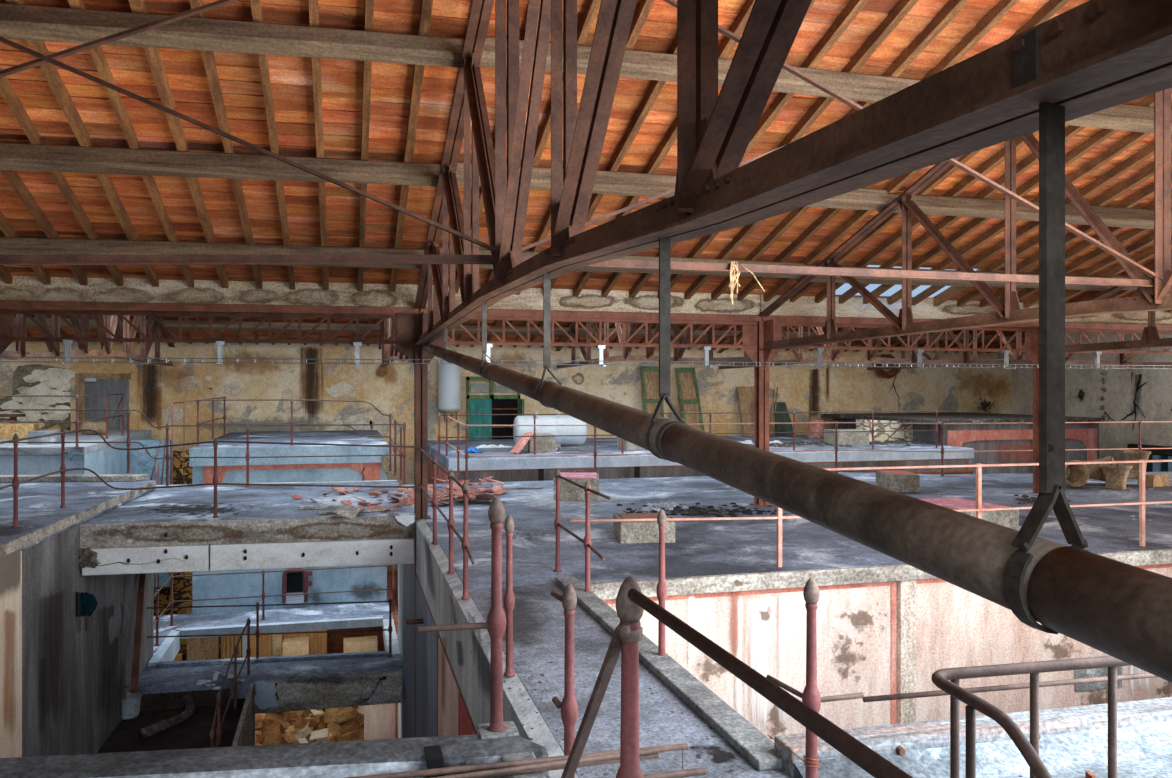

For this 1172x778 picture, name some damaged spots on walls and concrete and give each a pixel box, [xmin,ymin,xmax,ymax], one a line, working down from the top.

spalling [0,364,75,430]
leakage [139,364,161,427]
leakage [205,347,328,432]
crack [1104,372,1147,431]
spalling [78,547,100,568]
leakage [835,611,887,678]